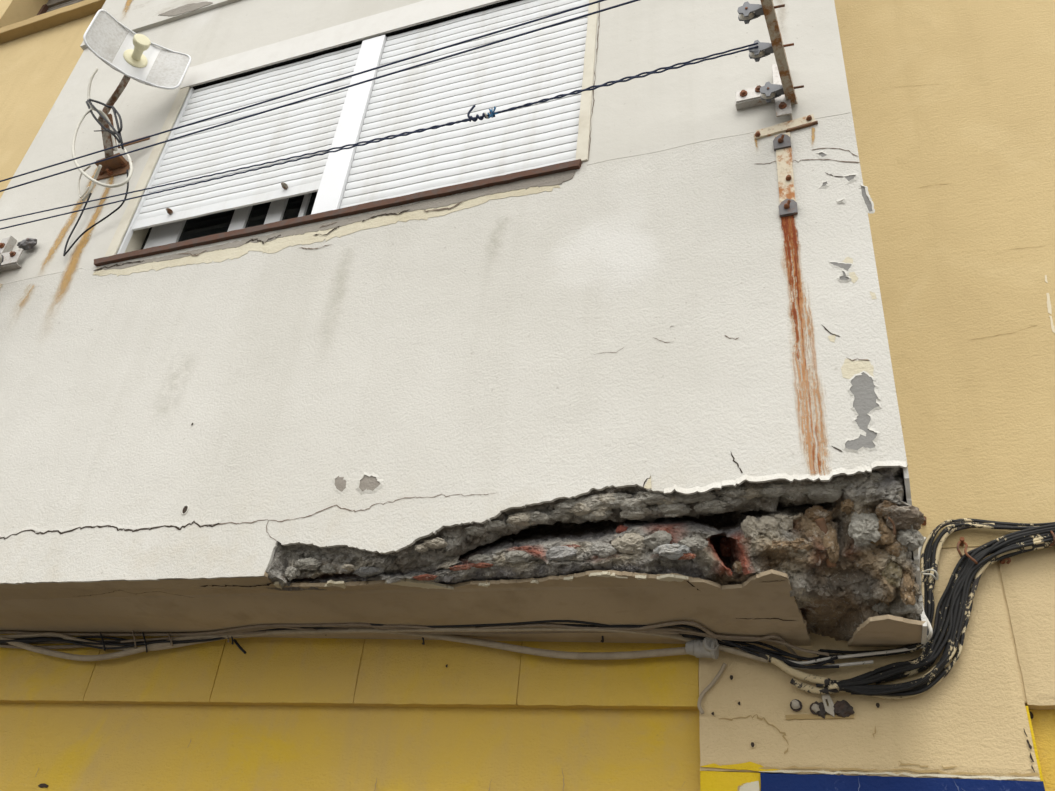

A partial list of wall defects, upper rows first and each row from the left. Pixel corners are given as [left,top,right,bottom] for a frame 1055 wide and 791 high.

rust [44,167,114,298]
flaking render [93,169,576,277]
spalling [818,173,875,214]
rust [781,215,827,475]
crack [0,493,492,540]
spalling [266,357,925,641]